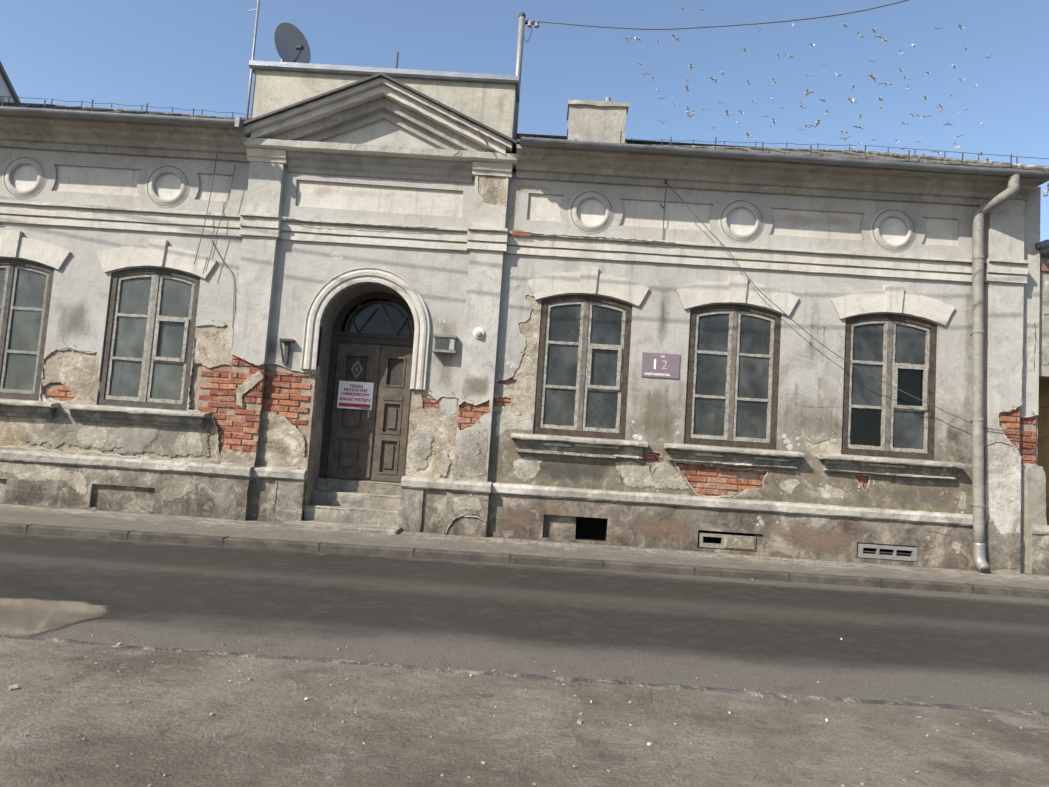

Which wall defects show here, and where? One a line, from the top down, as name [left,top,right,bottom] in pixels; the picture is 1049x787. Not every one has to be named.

spalling [0,320,323,514]
spalling [445,493,487,537]
spalling [404,269,542,480]
spalling [632,420,800,498]
peeling [815,474,870,500]
peeling [984,405,1037,571]